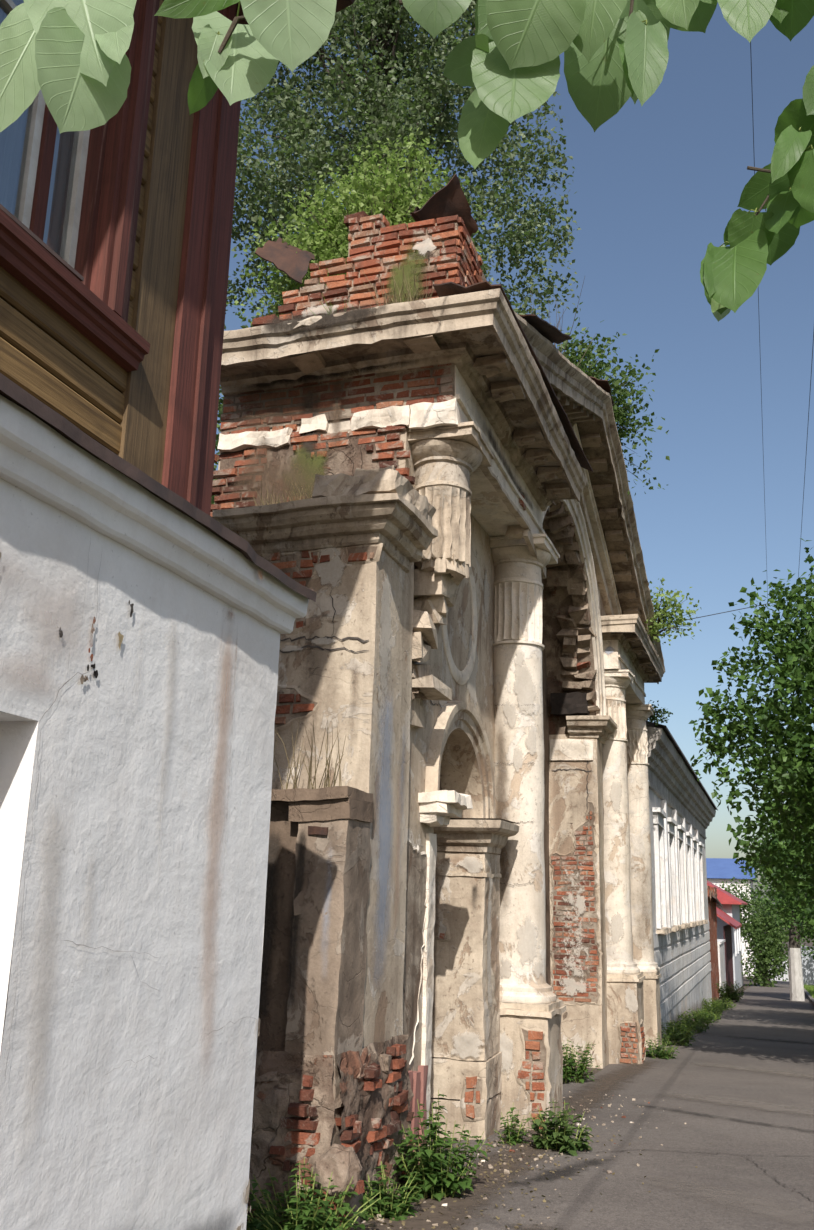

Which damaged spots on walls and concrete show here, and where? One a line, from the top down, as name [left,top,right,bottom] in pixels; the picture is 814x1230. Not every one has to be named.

spalling [210,363,458,517]
spalling [258,543,383,588]
spalling [80,617,98,684]
spalling [282,613,335,651]
crack [279,587,369,653]
spalling [274,685,322,734]
spalling [500,801,603,1007]
spalling [617,1019,646,1064]
spalling [514,1026,551,1130]